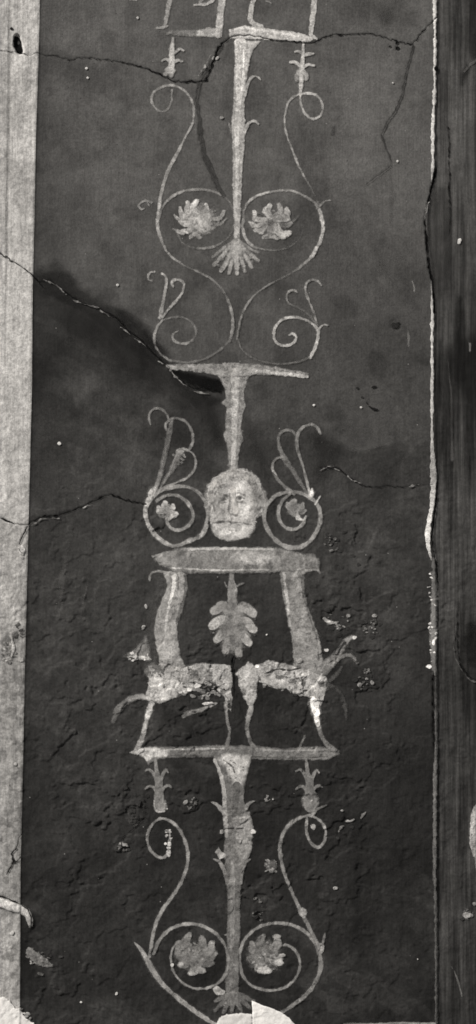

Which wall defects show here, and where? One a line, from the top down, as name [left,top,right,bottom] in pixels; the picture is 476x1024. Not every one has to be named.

crack [0,17,437,197]
crack [0,253,220,395]
crack [1,494,146,553]
crack [320,466,438,583]